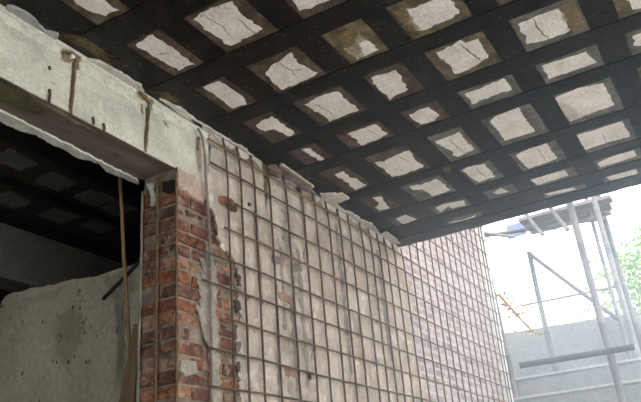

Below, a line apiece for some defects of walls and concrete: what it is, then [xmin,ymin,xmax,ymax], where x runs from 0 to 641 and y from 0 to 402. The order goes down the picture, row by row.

corrosion [61,50,81,114]
corrosion [137,91,153,152]
spalling [154,167,178,402]
spalling [159,98,512,402]